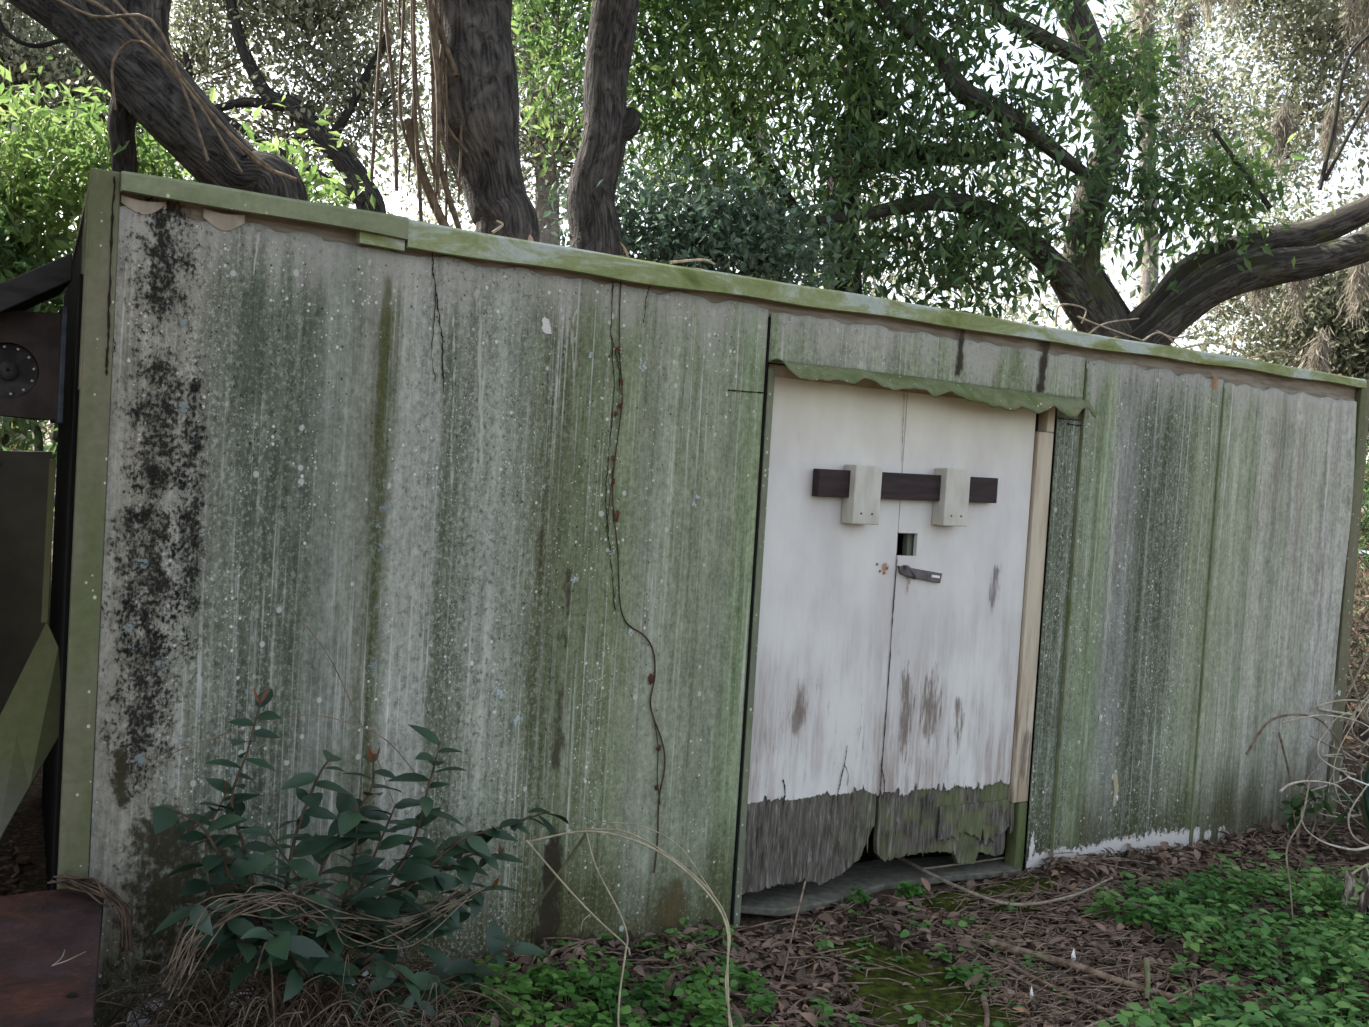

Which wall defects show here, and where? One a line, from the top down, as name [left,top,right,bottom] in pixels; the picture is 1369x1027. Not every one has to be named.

damp [95,196,261,988]
crack [605,279,651,611]
damp [793,685,806,732]
damp [900,670,965,760]